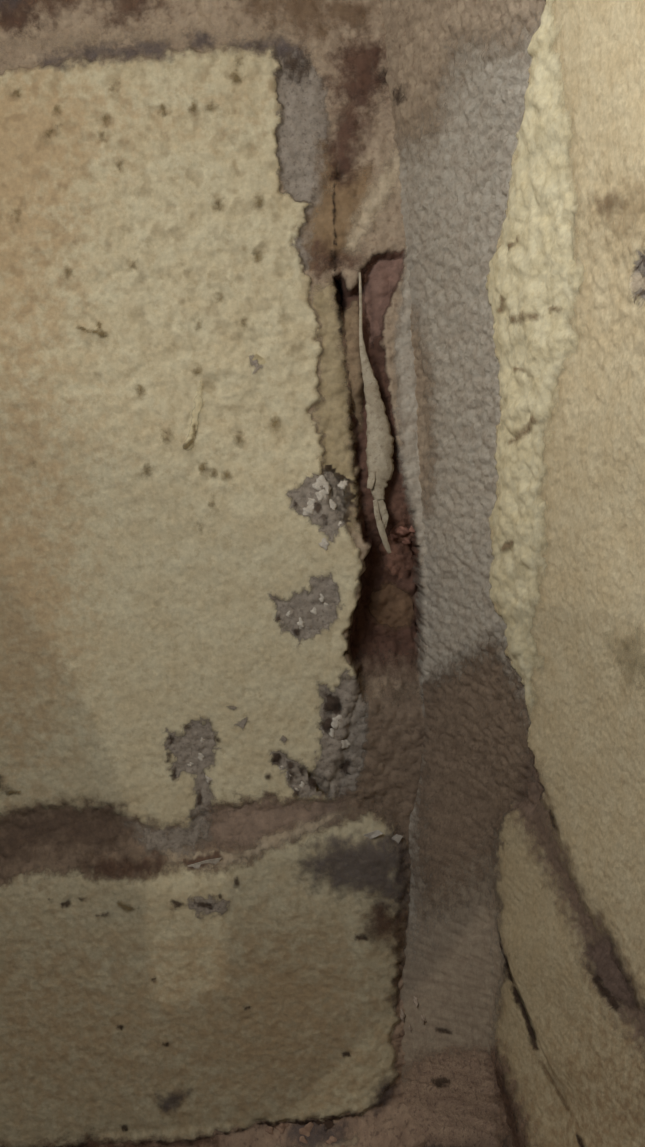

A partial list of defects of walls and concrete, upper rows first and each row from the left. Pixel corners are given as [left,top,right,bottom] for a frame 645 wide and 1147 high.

leakage [0,0,75,29]
flaking render [0,0,429,1019]
flaking render [380,0,645,1147]
leakage [303,835,406,940]
flaking render [81,1020,427,1147]
crack [488,943,568,1147]